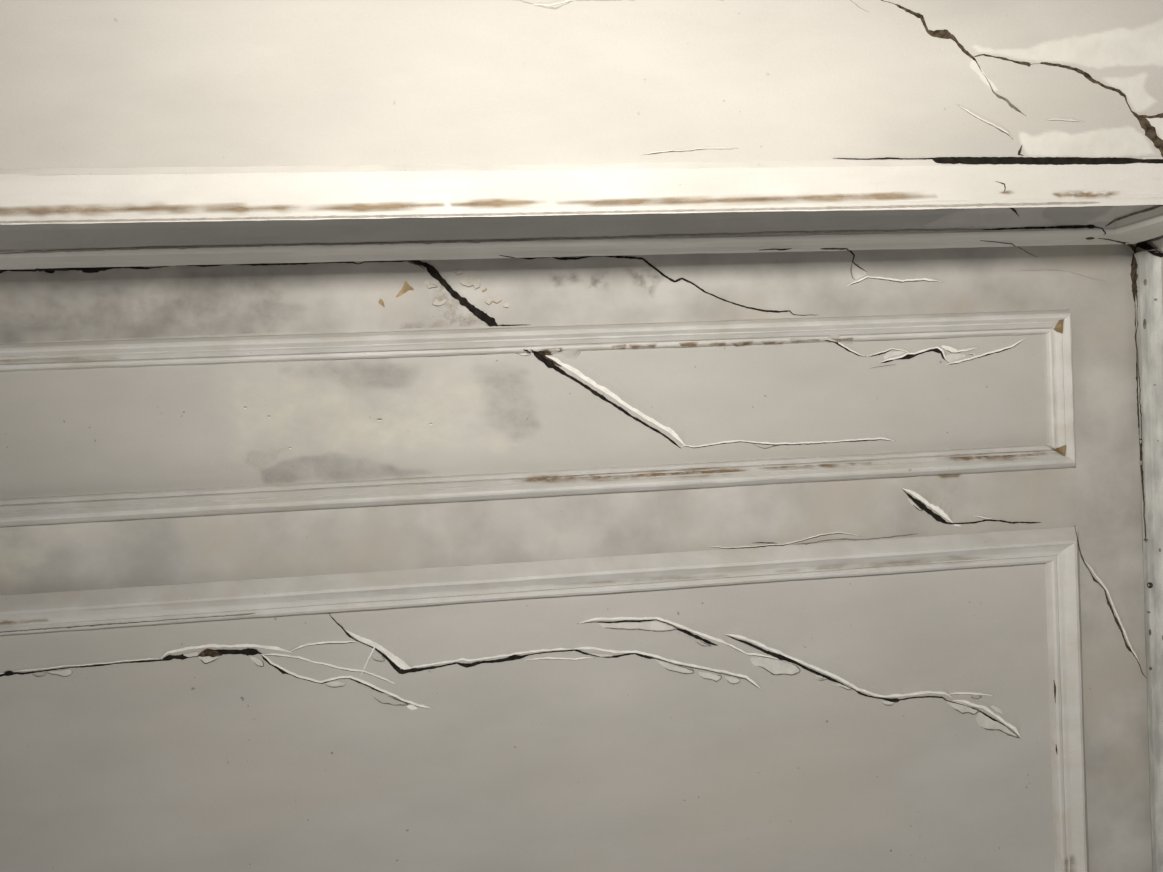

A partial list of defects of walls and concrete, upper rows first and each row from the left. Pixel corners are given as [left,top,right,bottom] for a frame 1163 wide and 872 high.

crack [517,0,616,10]
crack [850,0,1163,157]
peeling [378,279,446,318]
crack [822,248,943,287]
crack [0,255,896,449]
crack [822,334,1026,369]
crack [706,482,1042,549]
crack [1075,528,1147,679]
crack [0,607,1021,739]